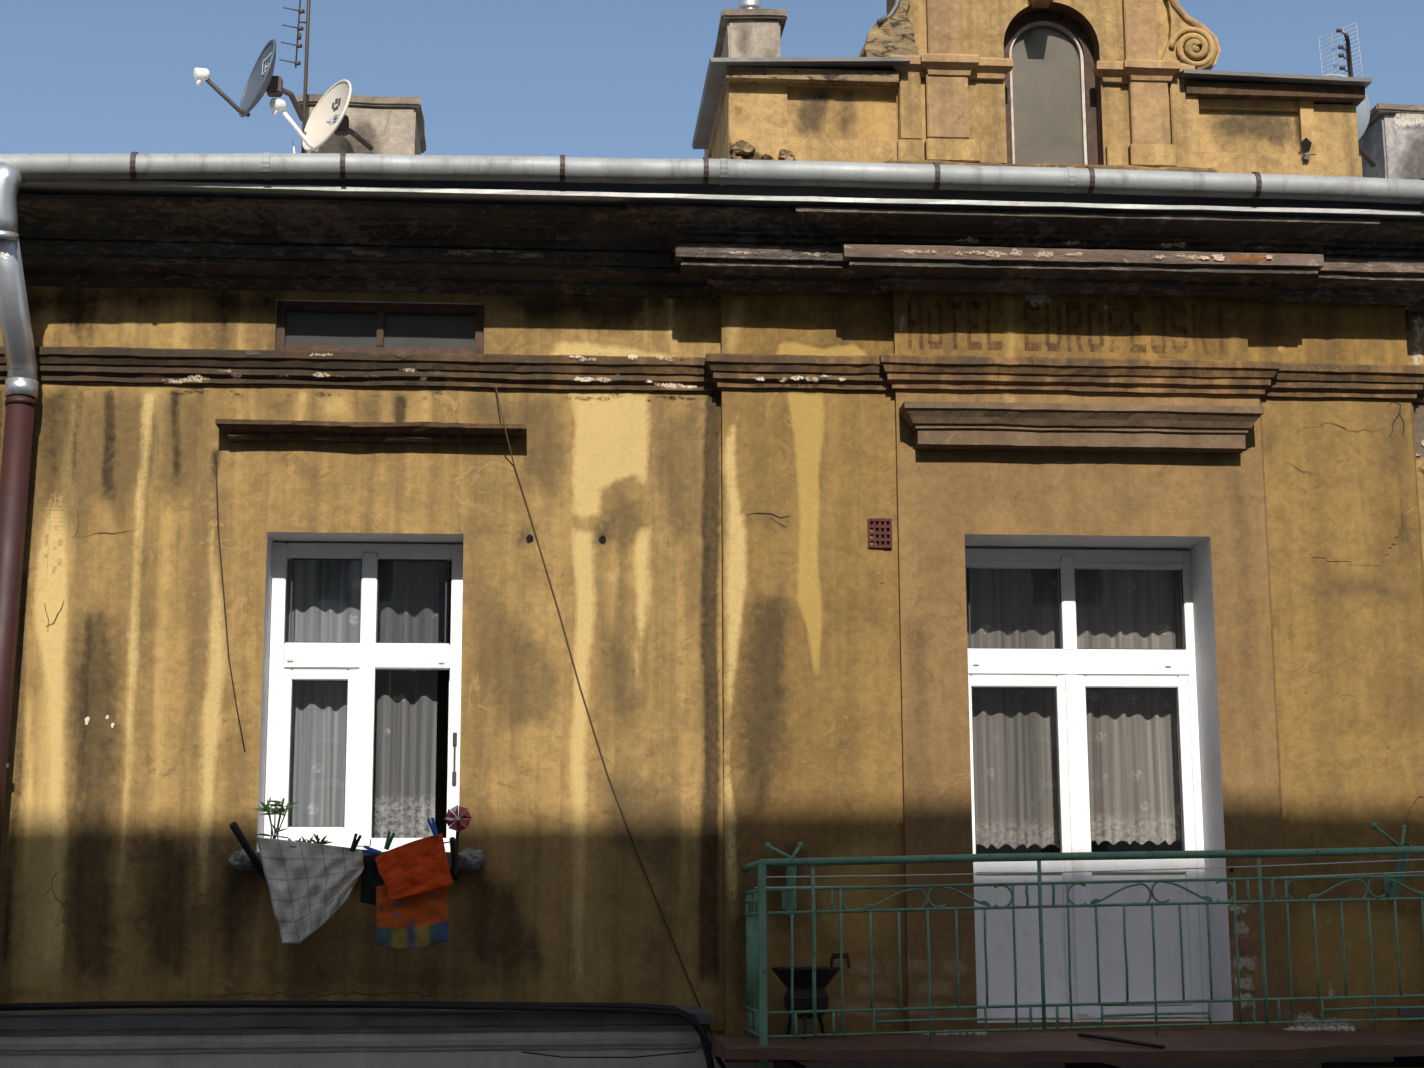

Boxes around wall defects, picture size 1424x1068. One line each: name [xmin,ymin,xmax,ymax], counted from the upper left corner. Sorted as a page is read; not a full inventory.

leakage [20,495,132,970]
leakage [102,395,114,490]
leakage [143,396,154,455]
leakage [145,586,222,966]
leakage [396,397,405,422]
leakage [571,532,594,927]
leakage [573,393,648,515]
leakage [636,529,647,628]
leakage [700,394,783,985]
leakage [789,394,823,658]